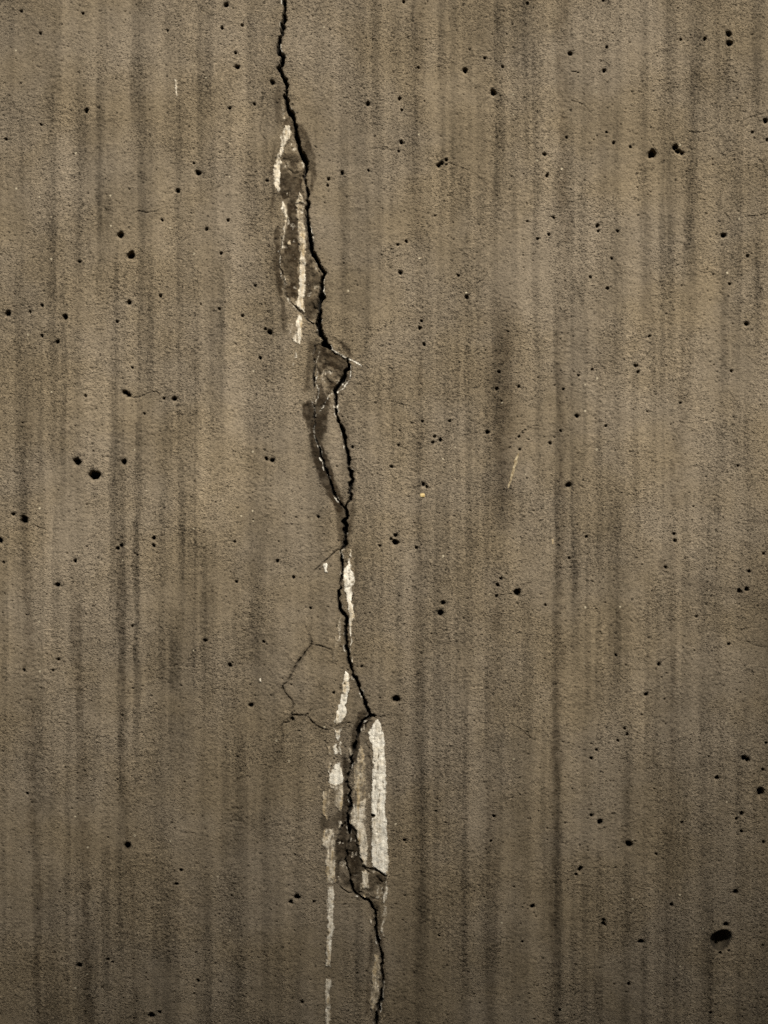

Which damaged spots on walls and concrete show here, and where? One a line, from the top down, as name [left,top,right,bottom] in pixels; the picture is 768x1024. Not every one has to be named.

spalling [276,111,323,323]
crack [259,0,393,1024]
damp [269,81,391,1024]
spalling [341,720,386,903]